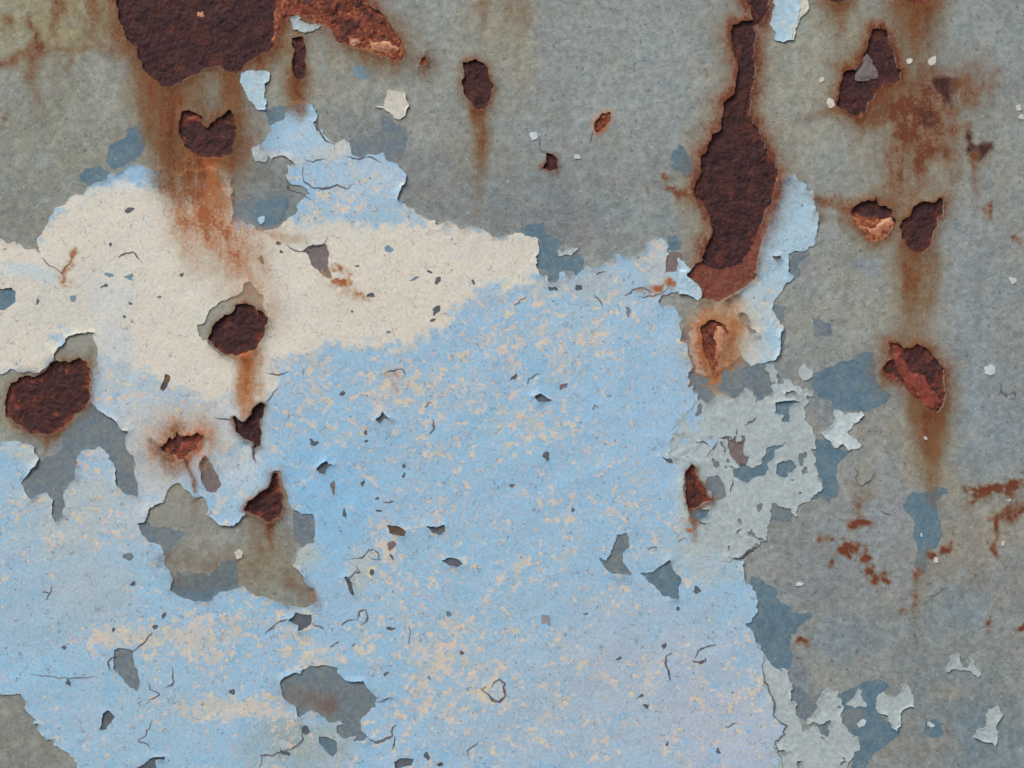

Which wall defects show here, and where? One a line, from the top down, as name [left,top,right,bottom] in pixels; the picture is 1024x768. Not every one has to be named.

peeling [240,70,290,126]
rust [108,0,430,280]
peeling [375,89,409,120]
rust [661,0,786,387]
rust [814,0,992,302]
rust [5,358,91,445]
rust [208,301,268,448]
peeling [0,103,914,768]
rust [242,473,285,540]
peeling [946,654,981,677]
peeling [924,719,944,738]
peeling [974,706,1003,746]